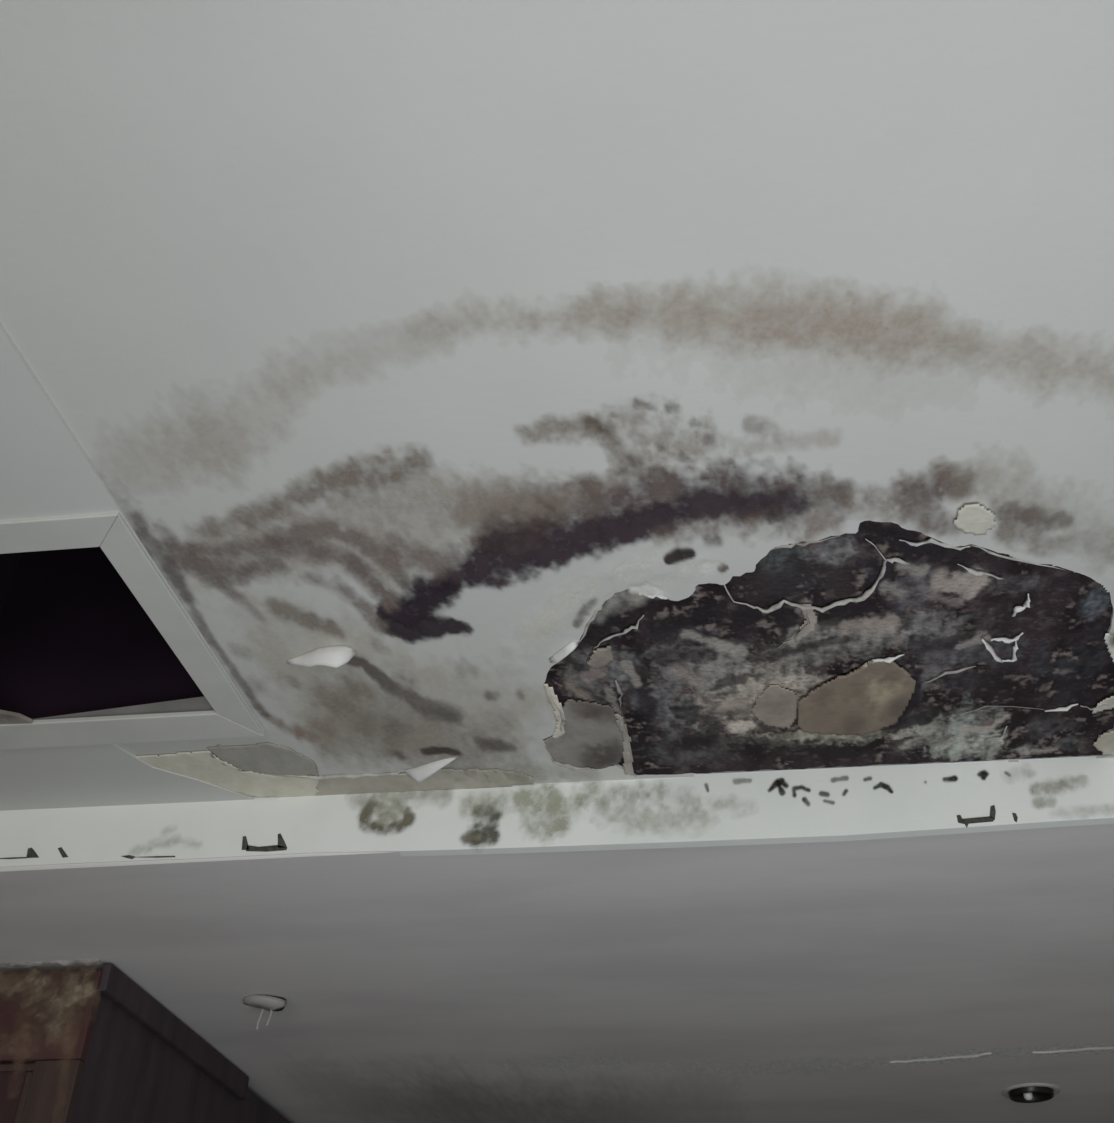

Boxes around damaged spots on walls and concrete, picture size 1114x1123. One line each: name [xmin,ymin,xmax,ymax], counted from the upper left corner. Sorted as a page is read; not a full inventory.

mould [899,465,971,531]
mould [998,504,1070,541]
damp [135,456,853,643]
peeling [286,645,356,668]
flaking render [542,520,1114,775]
damp [347,657,508,759]
peeling [135,742,534,798]
mould [360,792,414,832]
mould [462,803,500,845]
damp [515,787,567,835]
damp [768,778,848,805]
damp [864,777,893,793]